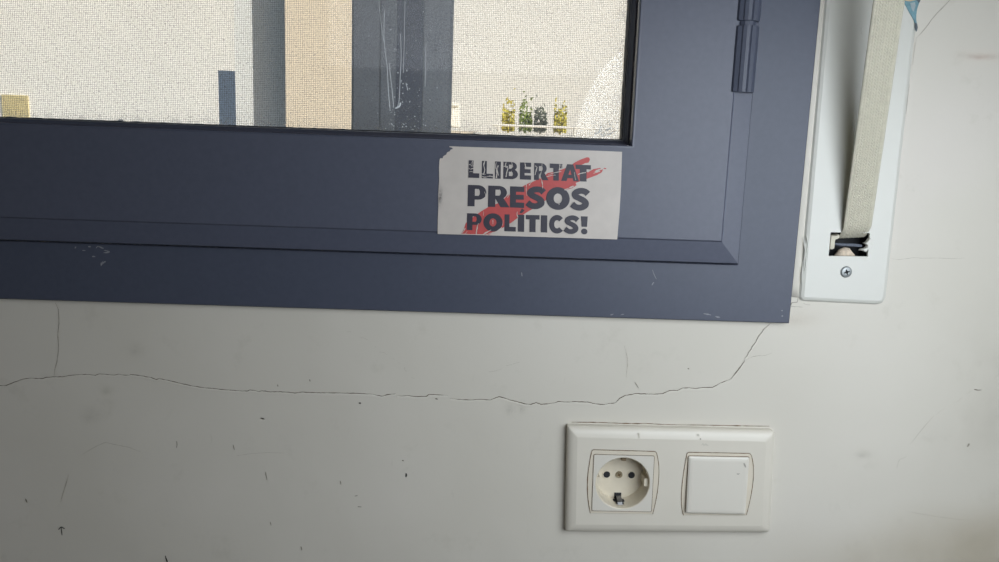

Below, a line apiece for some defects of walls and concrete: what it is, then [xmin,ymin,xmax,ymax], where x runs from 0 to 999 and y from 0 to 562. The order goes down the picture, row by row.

crack [0,305,771,408]